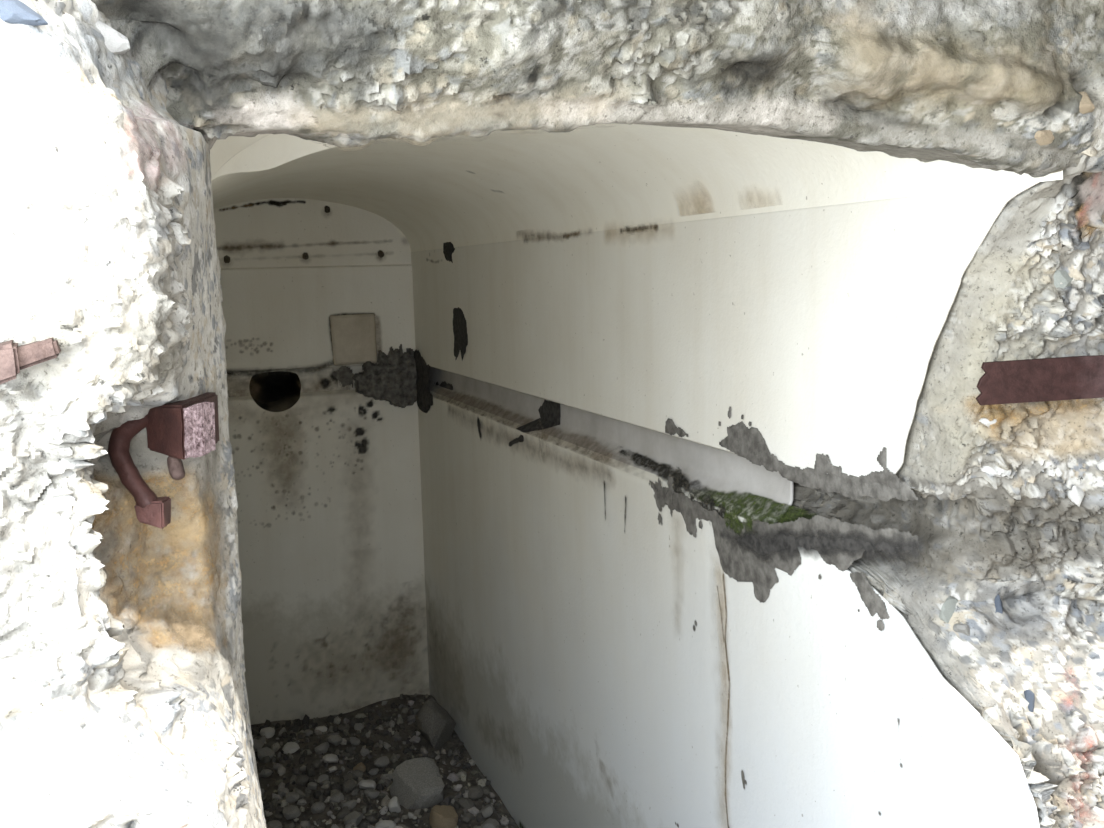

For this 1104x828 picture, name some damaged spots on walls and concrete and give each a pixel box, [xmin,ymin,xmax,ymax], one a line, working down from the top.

damp [226,362,337,393]
peeling [378,344,453,413]
damp [355,401,382,453]
peeling [665,418,688,437]
peeling [718,406,918,502]
rust [92,474,227,649]
spalling [650,482,919,631]